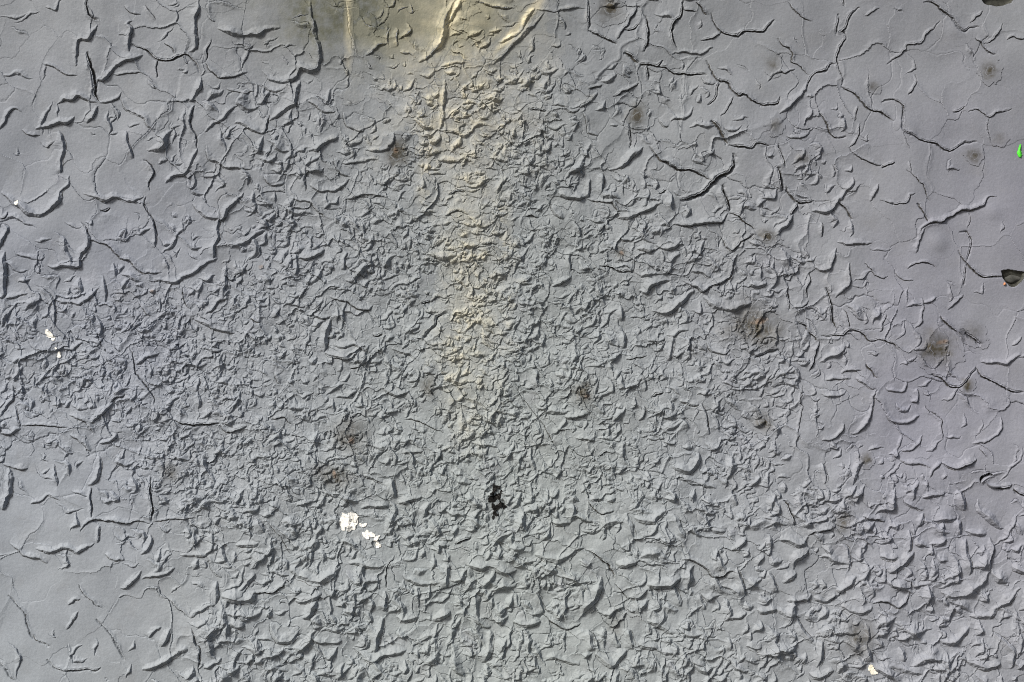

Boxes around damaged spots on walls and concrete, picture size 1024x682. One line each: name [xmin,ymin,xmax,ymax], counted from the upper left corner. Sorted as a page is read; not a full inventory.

crack [86,52,100,102]
crack [129,41,242,79]
peeling [501,67,606,219]
peeling [599,127,652,207]
crack [587,0,1024,293]
peeling [720,84,892,295]
peeling [493,179,847,573]
crack [785,272,900,378]
crack [932,316,1024,392]
crack [80,477,194,531]
peeling [868,435,932,515]
peeling [105,529,175,590]